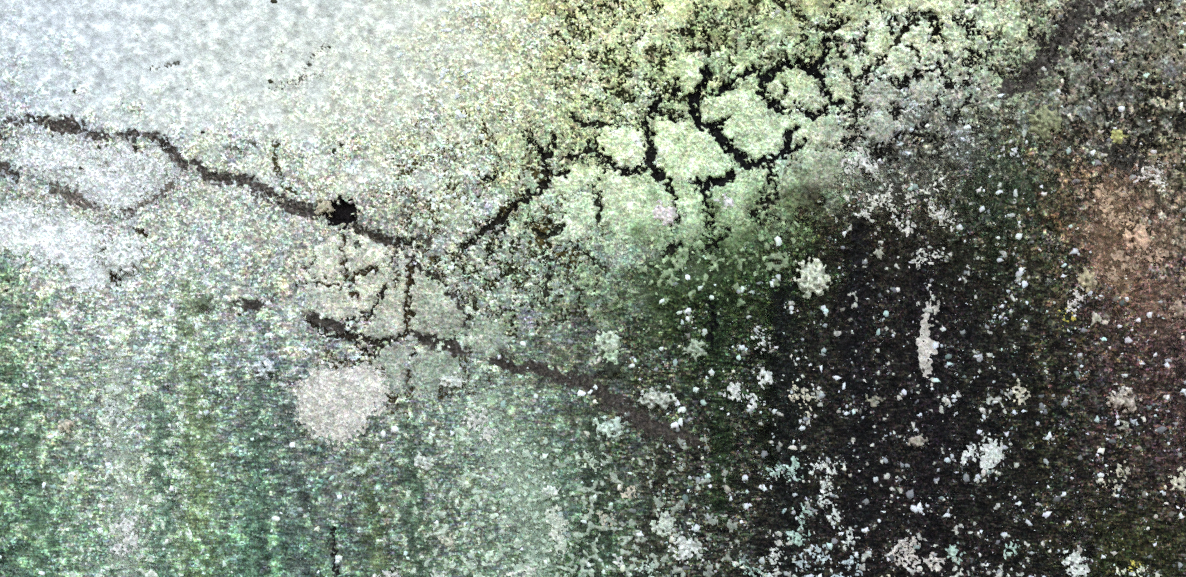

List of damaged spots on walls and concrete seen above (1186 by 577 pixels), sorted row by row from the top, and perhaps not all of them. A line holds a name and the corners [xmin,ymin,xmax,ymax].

crack [770,0,787,11]
crack [0,11,940,403]
water stain [92,329,160,577]
water stain [230,297,273,314]
water stain [275,390,313,577]
water stain [306,311,358,343]
water stain [407,326,471,358]
water stain [446,376,620,577]
water stain [634,435,678,577]
water stain [702,160,1092,577]